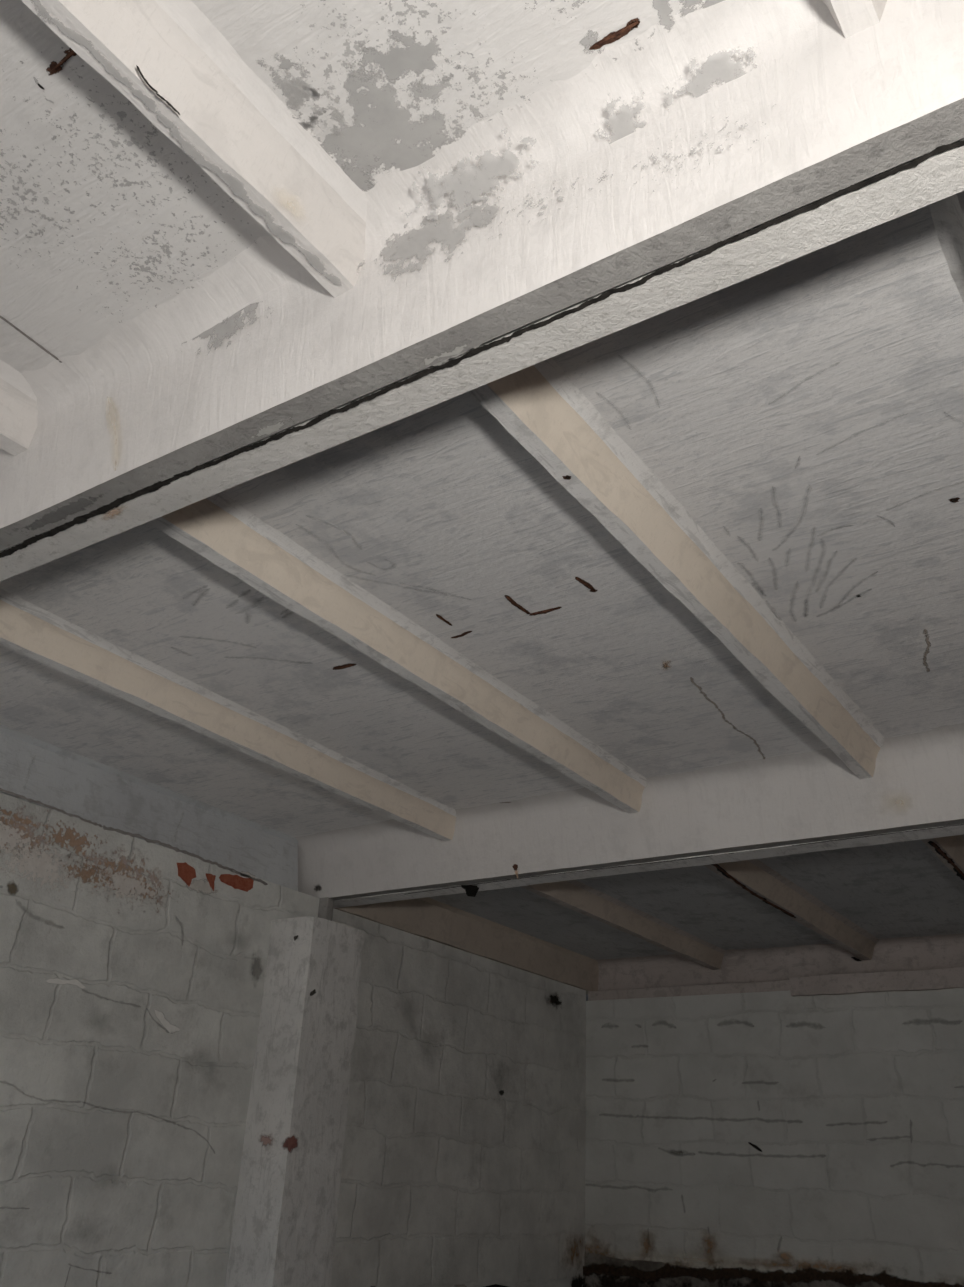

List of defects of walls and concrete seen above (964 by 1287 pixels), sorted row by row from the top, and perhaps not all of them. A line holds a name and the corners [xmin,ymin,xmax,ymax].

spalling [580,0,724,60]
peeling [666,49,757,110]
peeling [258,0,613,280]
peeling [597,92,646,143]
peeling [183,302,258,354]
crack [0,140,964,558]
crack [690,677,765,759]
peeling [0,807,170,910]
flaking render [177,862,255,894]
leakage [567,1238,964,1287]